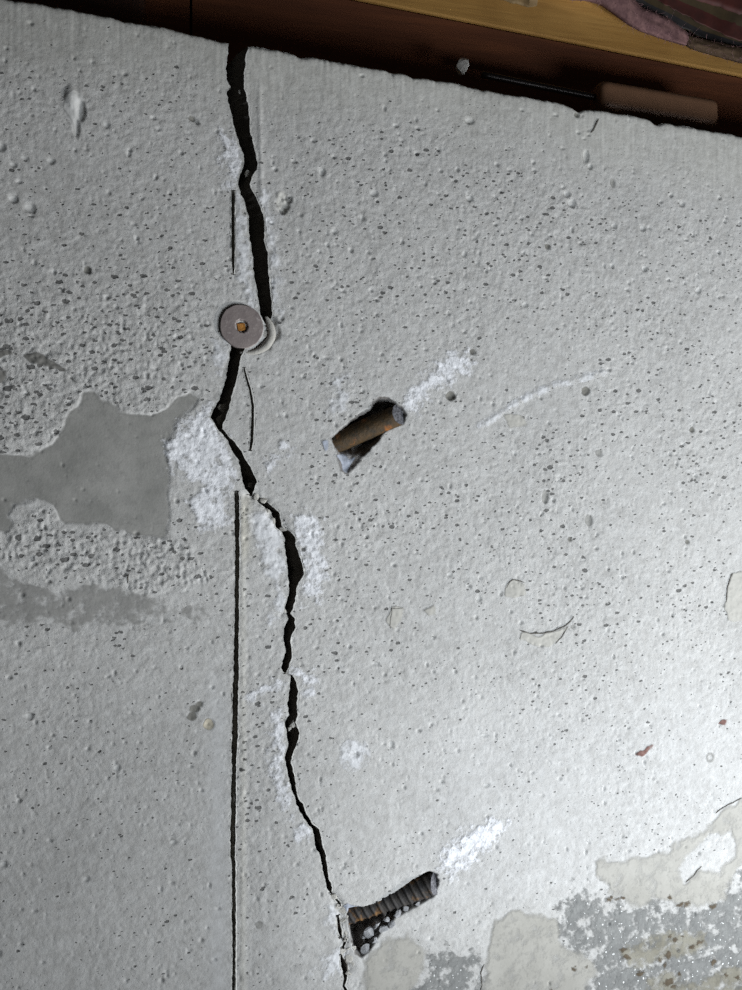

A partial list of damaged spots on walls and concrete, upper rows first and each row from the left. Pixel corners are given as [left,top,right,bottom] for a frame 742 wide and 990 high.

peeling [0,392,196,537]
crack [209,44,356,990]
damp [412,948,488,990]
peeling [482,911,596,990]
damp [556,870,742,990]